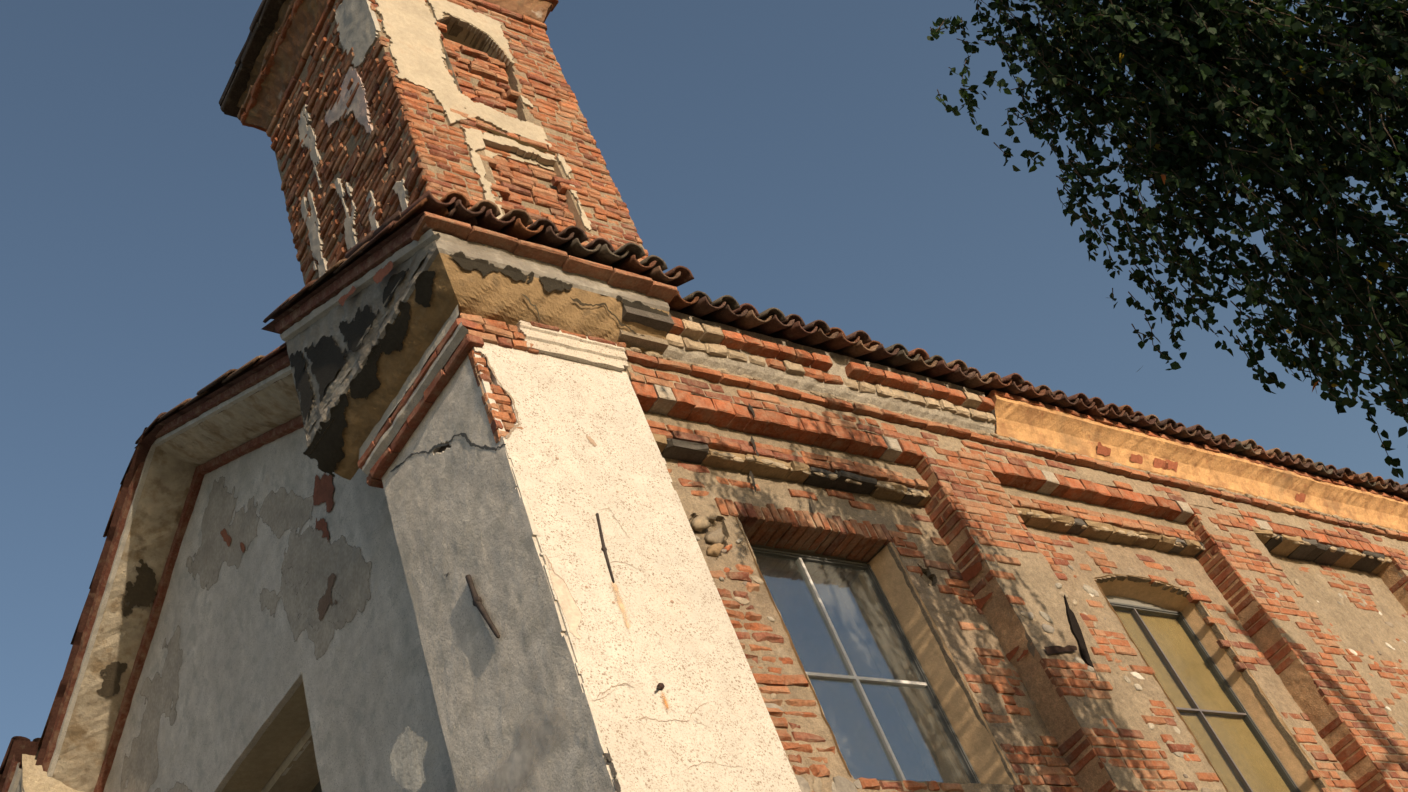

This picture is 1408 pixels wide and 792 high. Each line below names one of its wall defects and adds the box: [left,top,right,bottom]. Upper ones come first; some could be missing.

flaking render [467,349,523,443]
crack [390,433,506,472]
peeling [186,474,372,659]
crack [592,683,741,770]